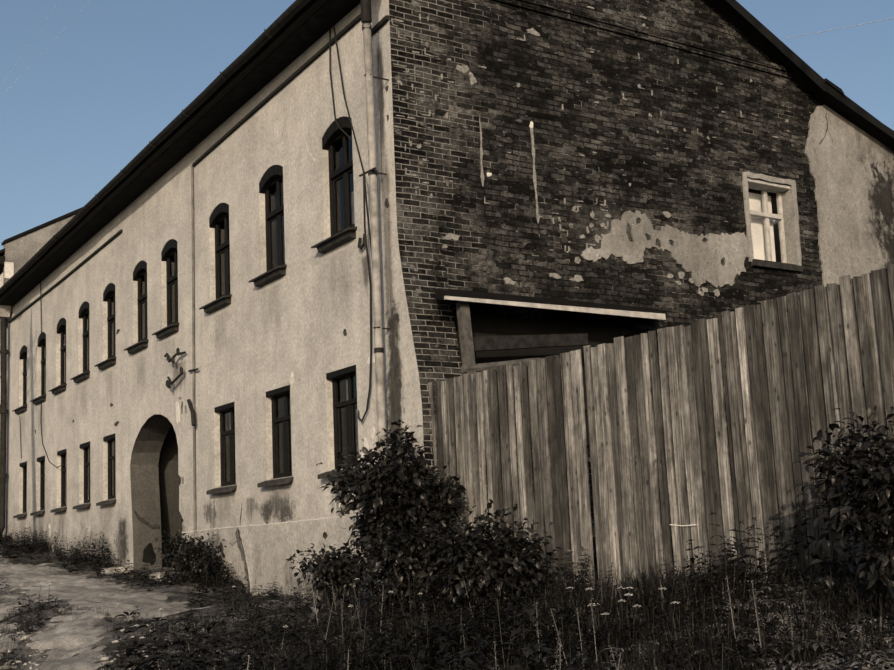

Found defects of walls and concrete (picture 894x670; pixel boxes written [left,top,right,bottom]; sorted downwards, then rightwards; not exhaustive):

peeling [385,63,424,102]
spalling [412,40,486,85]
flaking render [538,198,750,297]
damp [868,165,894,268]
damp [387,306,405,446]
damp [261,497,290,522]